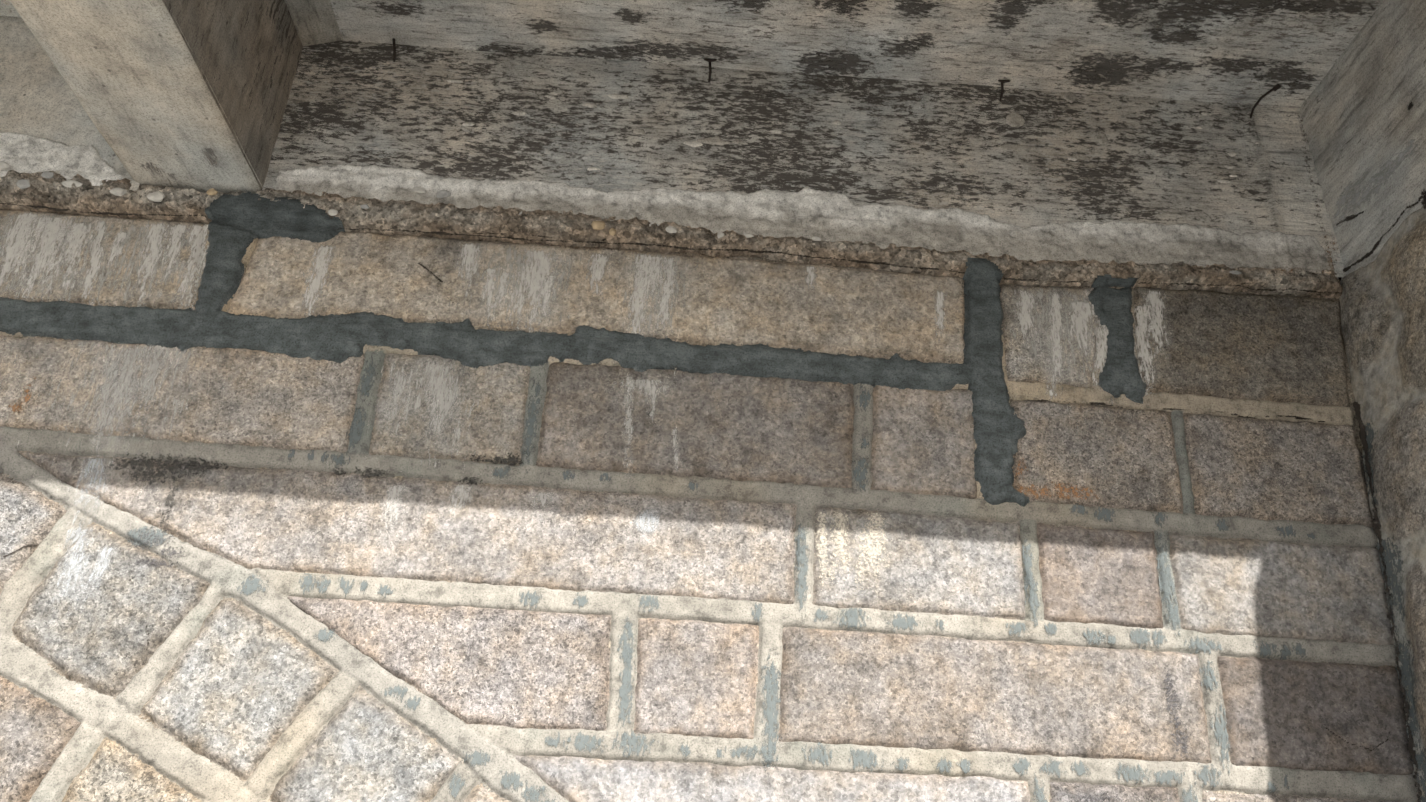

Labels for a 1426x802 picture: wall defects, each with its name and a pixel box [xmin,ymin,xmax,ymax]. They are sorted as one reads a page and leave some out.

water stain [357,0,433,18]
water stain [457,3,762,65]
water stain [715,0,782,14]
water stain [790,0,944,79]
water stain [984,0,1375,100]
water stain [0,212,209,310]
water stain [302,245,336,316]
water stain [449,243,698,337]
water stain [934,291,947,335]
crack [1004,276,1090,284]
crack [1138,190,1426,294]
water stain [1002,288,1108,427]